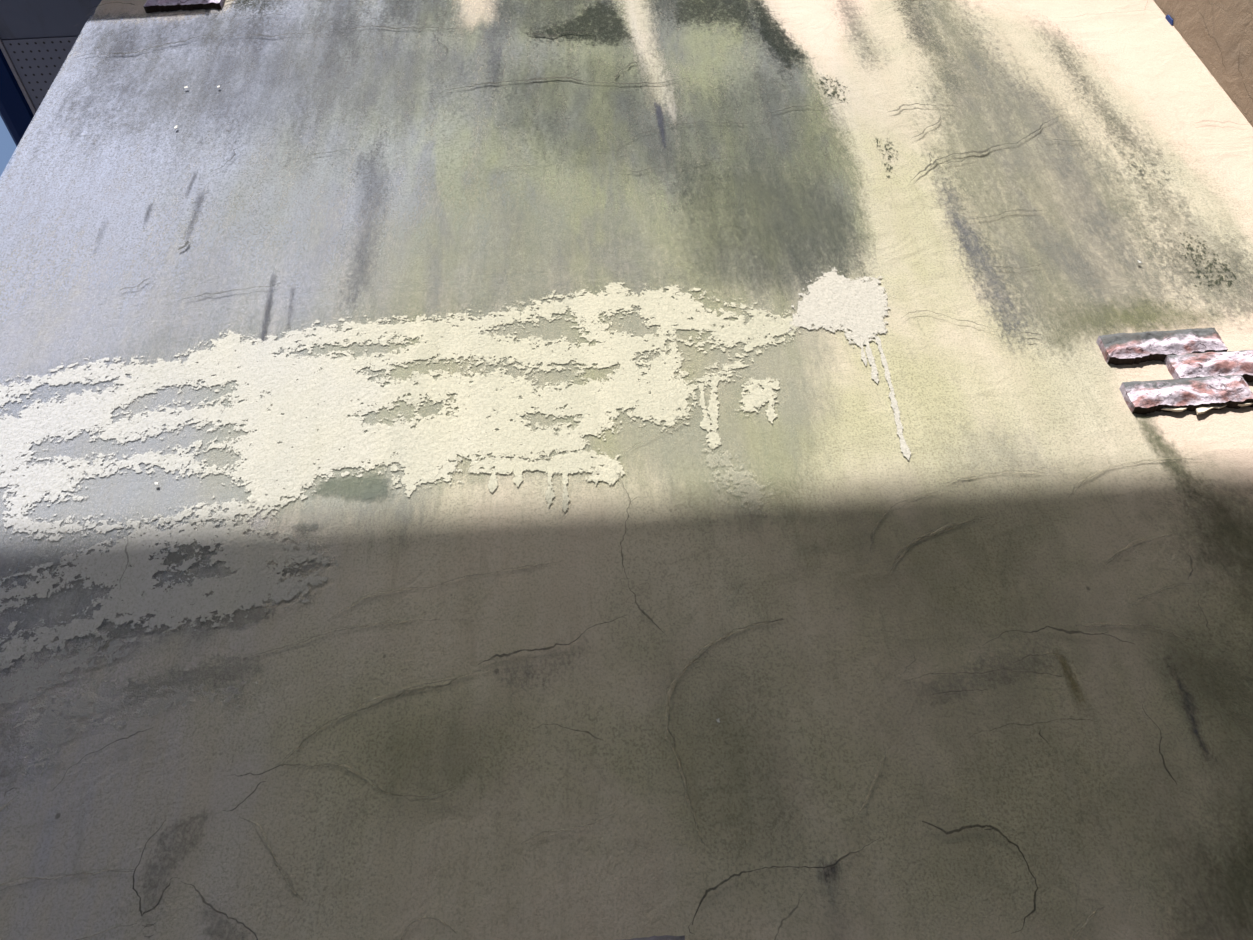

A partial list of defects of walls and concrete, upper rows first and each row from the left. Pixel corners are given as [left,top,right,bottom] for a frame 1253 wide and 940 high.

damp [895,0,1240,338]
damp [0,0,862,674]
damp [1141,414,1178,470]
crack [478,469,665,665]
crack [906,626,1134,679]
crack [223,764,297,811]
crack [1142,704,1177,784]
crack [132,821,258,940]
crack [688,839,878,934]
crack [922,821,1038,933]